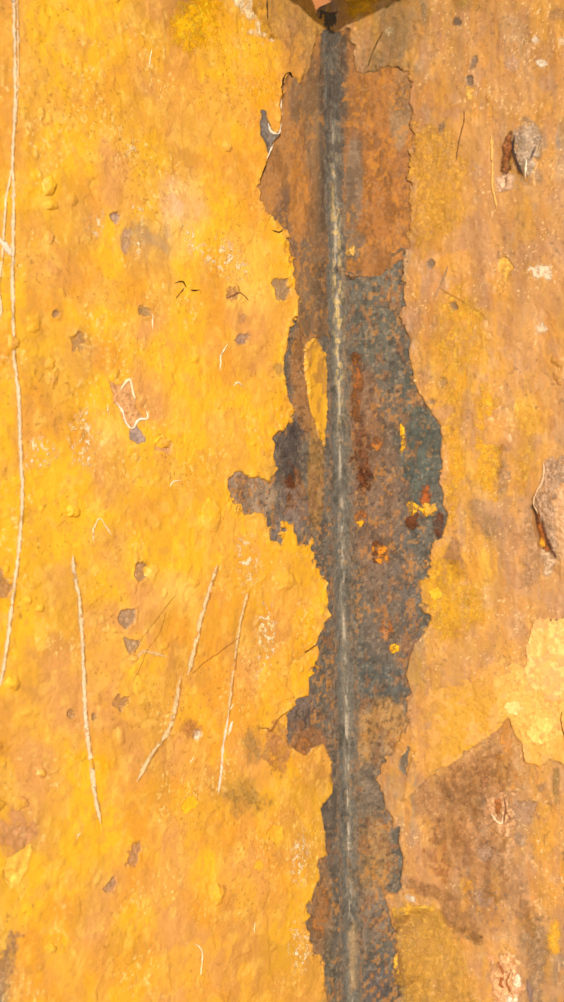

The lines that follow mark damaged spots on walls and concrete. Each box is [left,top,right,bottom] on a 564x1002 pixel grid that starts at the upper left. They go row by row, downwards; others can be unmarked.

peeling [228,34,342,1002]
peeling [338,29,564,1002]
rust [414,724,527,917]